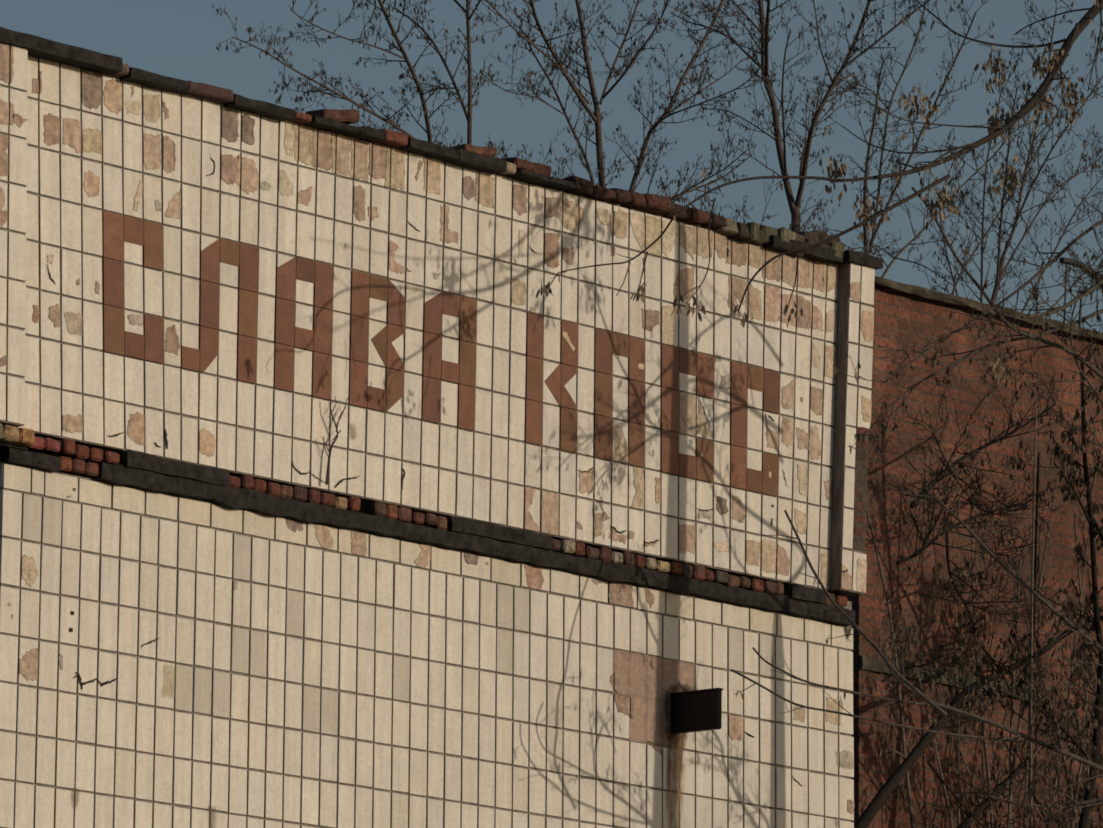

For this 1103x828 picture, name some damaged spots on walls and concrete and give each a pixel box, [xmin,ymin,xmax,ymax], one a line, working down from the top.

peeling [0,43,14,83]
peeling [0,99,28,226]
peeling [43,113,102,154]
peeling [221,109,312,206]
peeling [284,121,459,244]
peeling [463,173,495,209]
peeling [545,197,874,496]
crack [292,460,359,488]
peeling [524,487,559,536]
crack [74,672,118,690]
peeling [610,649,695,755]
corrosion [664,727,685,828]